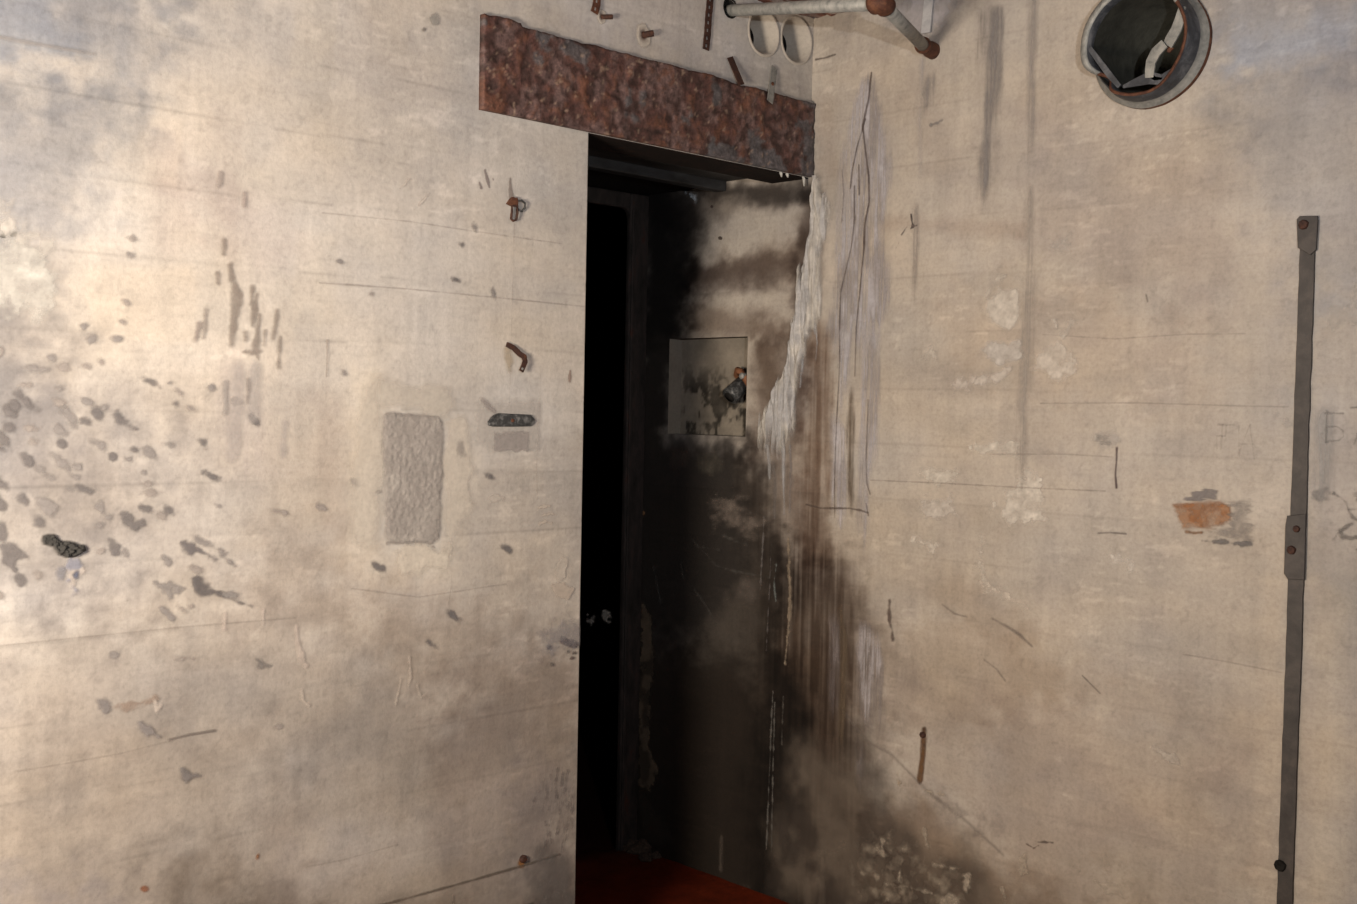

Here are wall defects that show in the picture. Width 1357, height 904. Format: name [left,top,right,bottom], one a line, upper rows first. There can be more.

peeling [0,218,54,309]
water stain [758,80,887,522]
water stain [766,751,992,904]